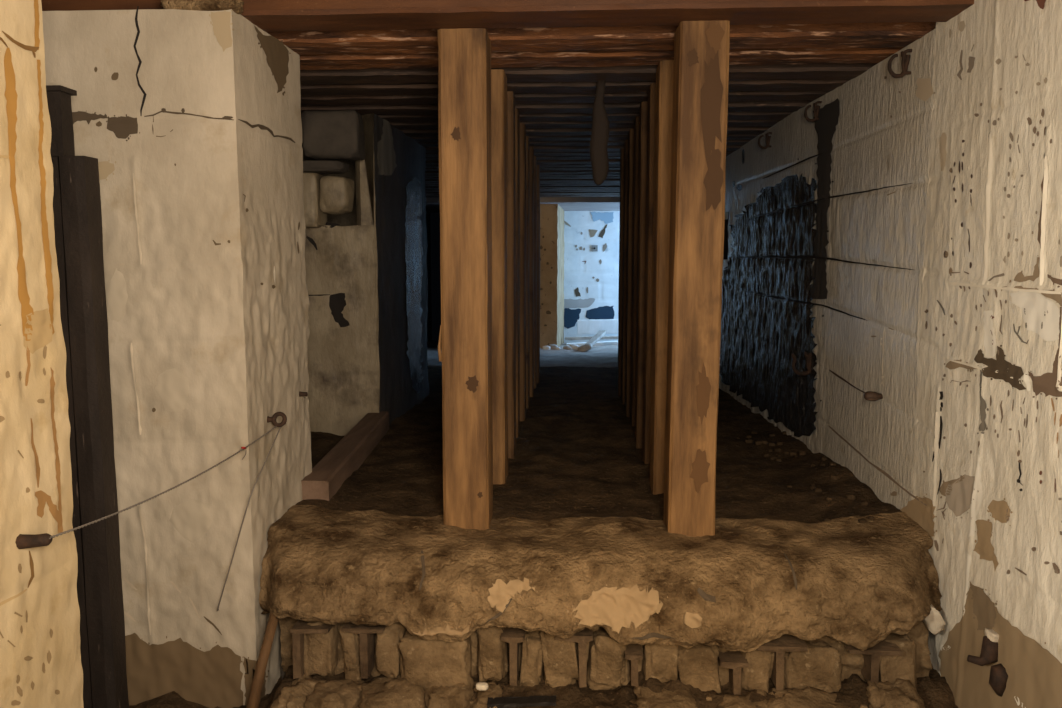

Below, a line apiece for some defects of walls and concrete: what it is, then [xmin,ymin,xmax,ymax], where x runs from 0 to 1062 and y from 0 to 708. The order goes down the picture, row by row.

crack [134,6,296,143]
spalling [254,25,291,96]
corrosion [4,0,55,386]
spalling [329,293,349,327]
peeling [944,222,972,292]
peeling [942,233,1062,463]